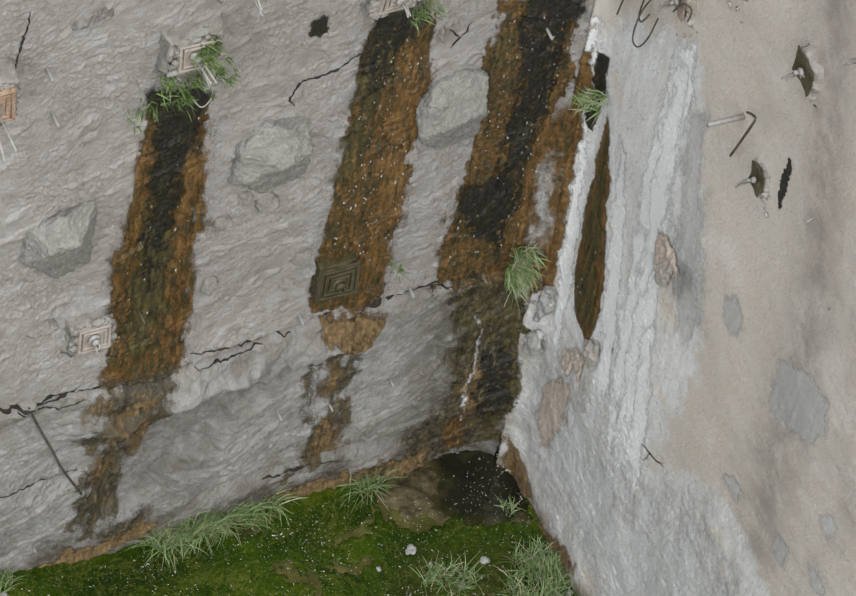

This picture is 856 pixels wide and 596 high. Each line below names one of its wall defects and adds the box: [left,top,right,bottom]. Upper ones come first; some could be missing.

damp [308,7,443,316]
crack [0,381,111,418]
damp [64,81,216,548]
crack [179,331,291,371]
damp [280,351,362,485]
crack [348,274,484,320]
damp [401,0,728,596]